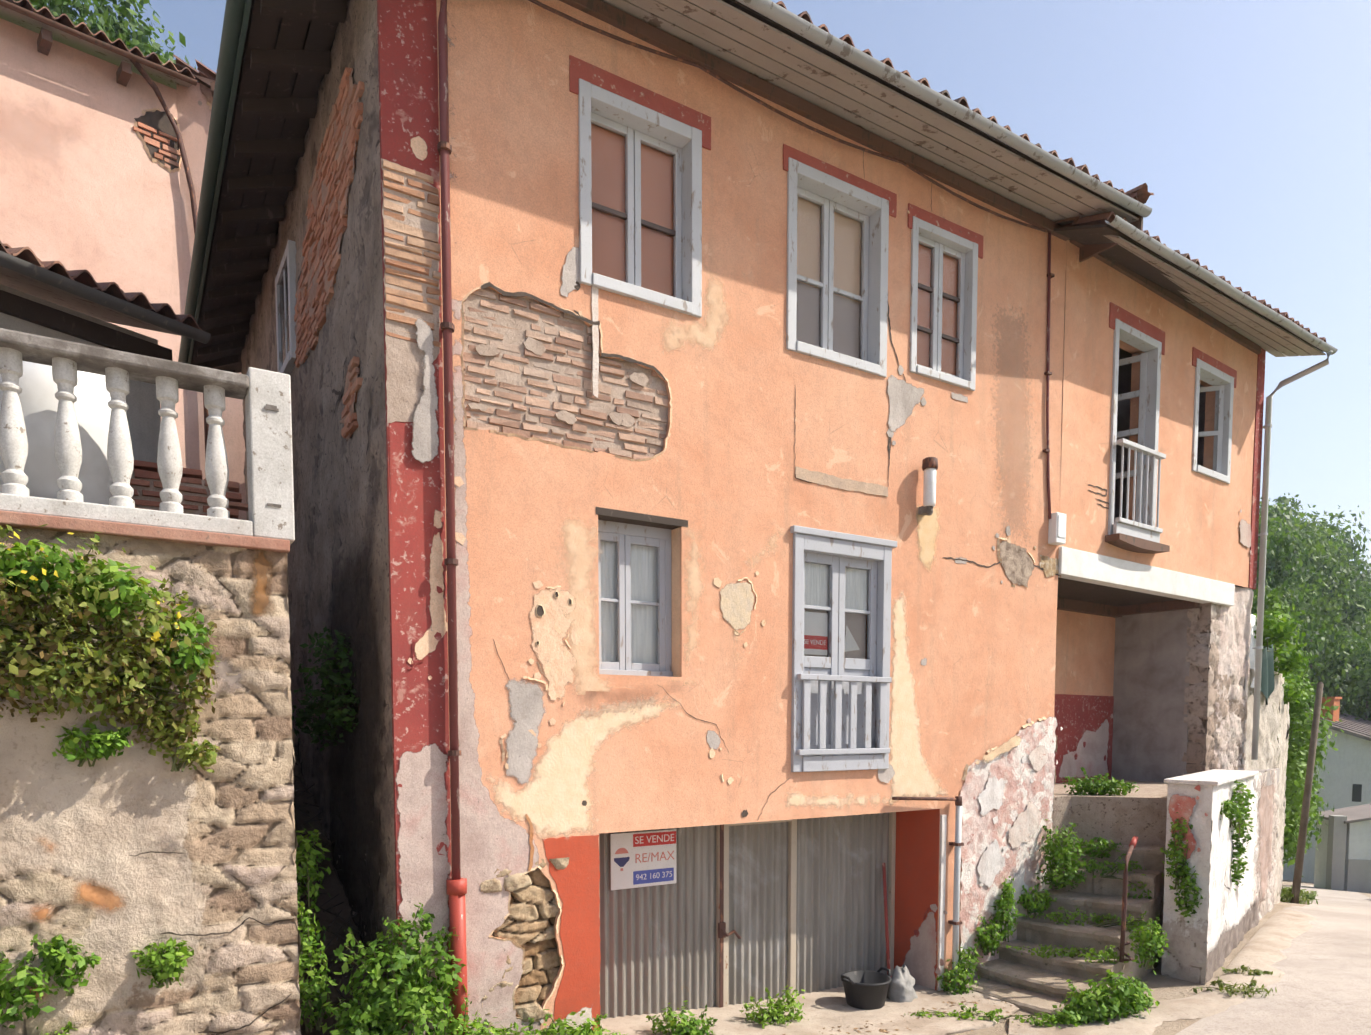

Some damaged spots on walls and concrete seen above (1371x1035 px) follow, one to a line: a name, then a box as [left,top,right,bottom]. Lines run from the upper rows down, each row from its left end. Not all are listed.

spalling [133,108,182,173]
spalling [294,67,365,368]
peeling [664,281,728,351]
spalling [340,356,363,441]
peeling [887,365,927,445]
spalling [381,136,679,1035]
peeling [713,571,766,647]
crack [943,557,1000,568]
crack [658,685,729,752]
damp [326,548,383,977]
peeling [787,596,1113,990]
peeling [1168,785,1208,859]